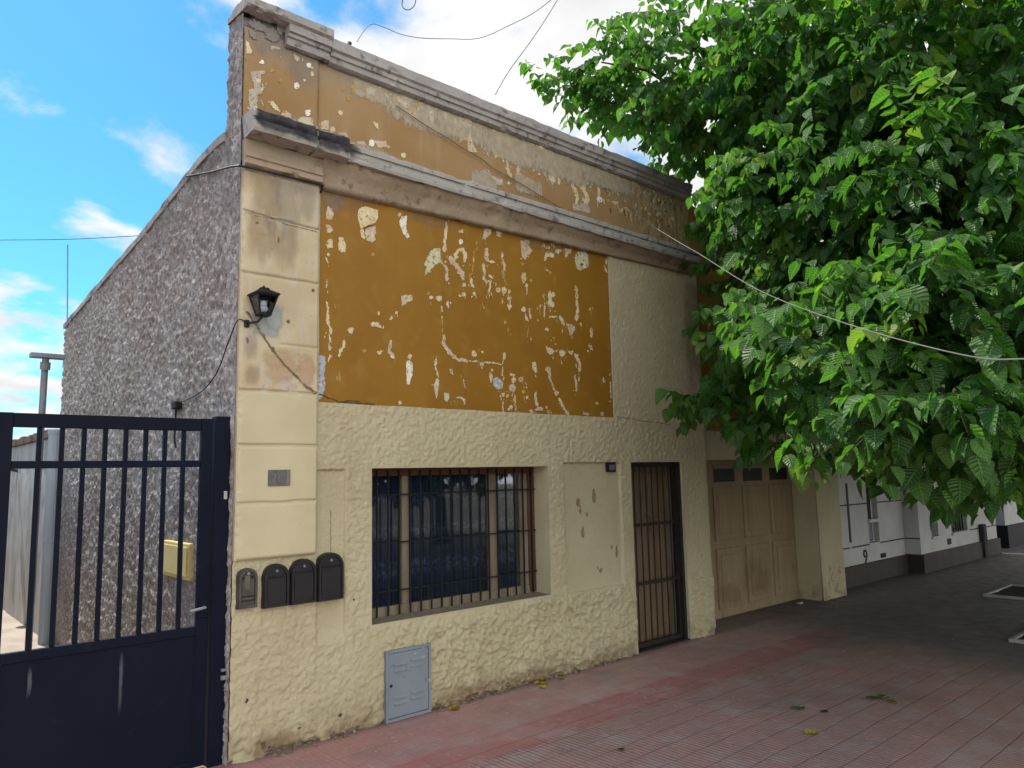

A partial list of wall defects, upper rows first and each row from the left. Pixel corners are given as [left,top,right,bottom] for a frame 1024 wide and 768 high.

leakage [256,108,394,157]
peeling [245,19,676,229]
peeling [325,206,346,267]
peeling [357,206,379,257]
peeling [398,213,409,238]
peeling [305,280,354,404]
peeling [362,340,413,385]
peeling [370,295,413,328]
peeling [424,220,594,415]
peeling [576,488,596,538]